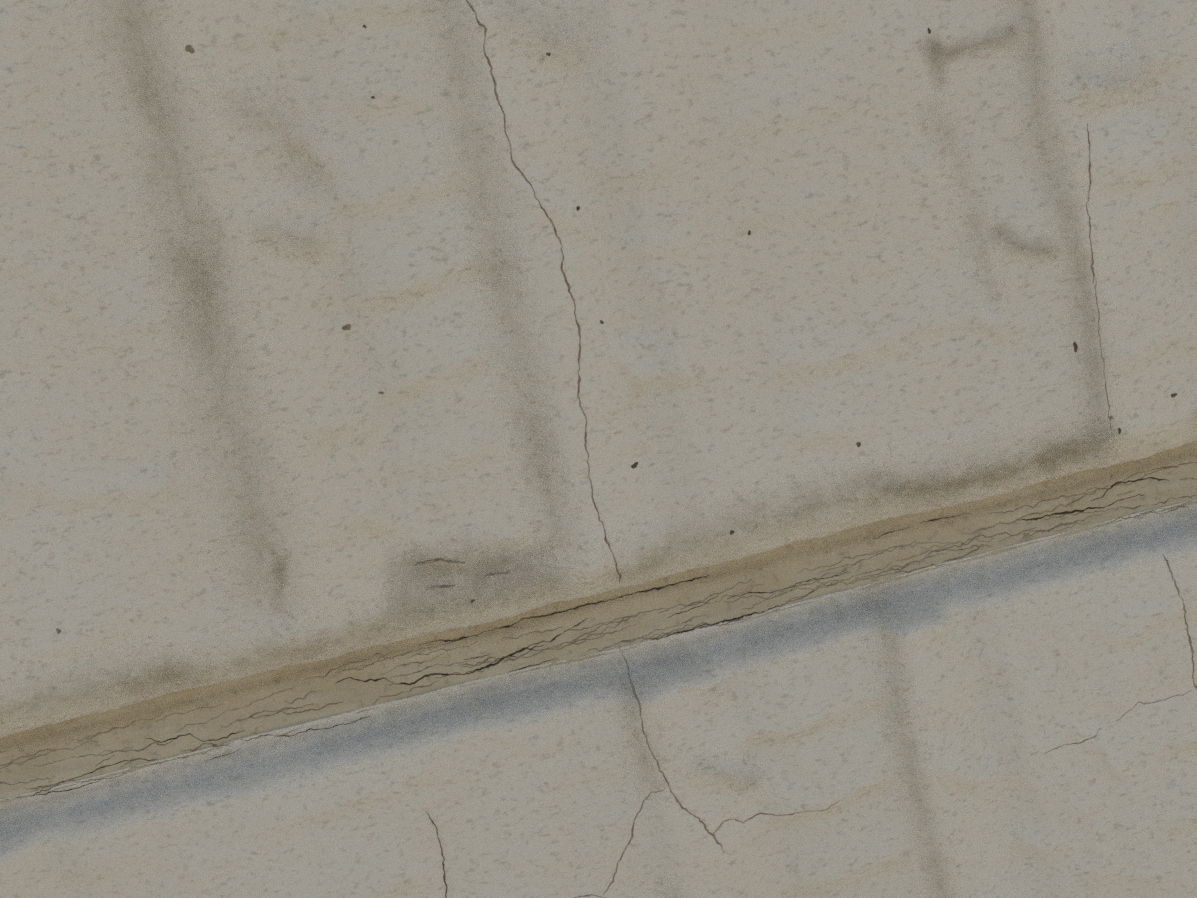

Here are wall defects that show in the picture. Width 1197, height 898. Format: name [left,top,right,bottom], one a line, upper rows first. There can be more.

crack [466,0,622,583]
crack [0,462,1197,898]